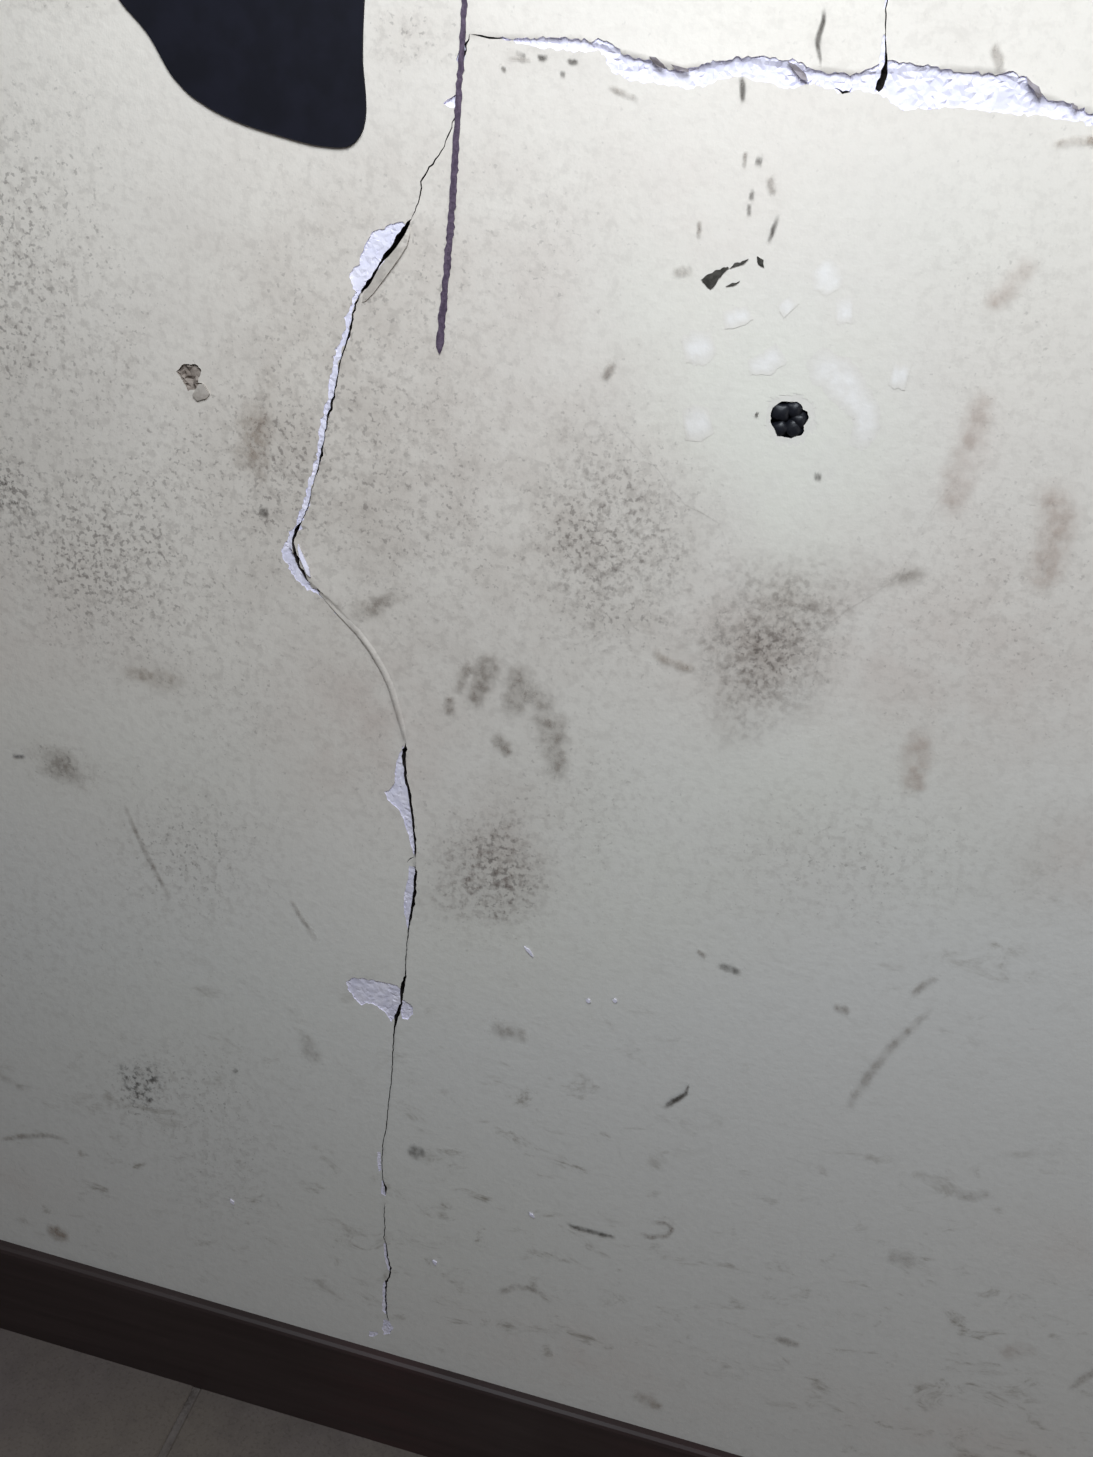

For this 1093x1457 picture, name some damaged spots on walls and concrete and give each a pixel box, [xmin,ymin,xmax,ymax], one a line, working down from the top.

peeling [456,34,1093,126]
crack [869,0,888,94]
spalling [349,222,405,293]
crack [281,117,455,1336]
spalling [385,747,415,853]
spalling [346,977,413,1022]